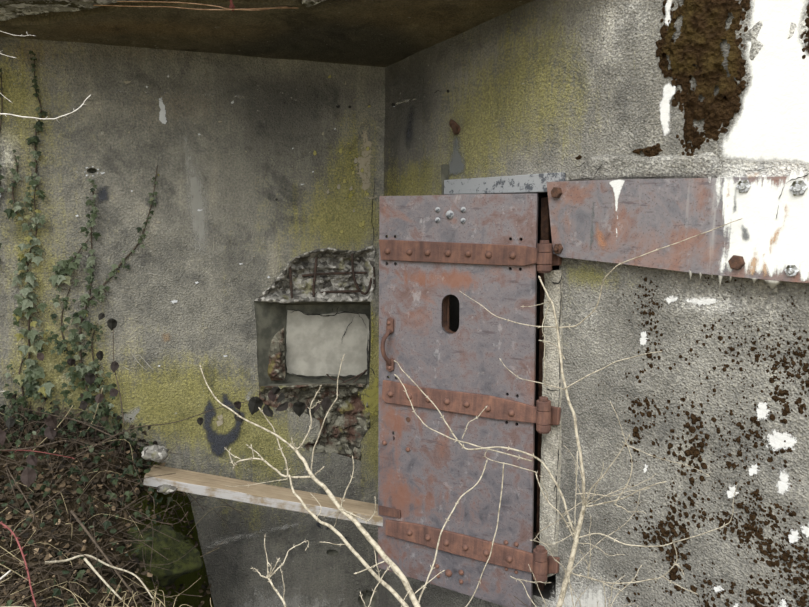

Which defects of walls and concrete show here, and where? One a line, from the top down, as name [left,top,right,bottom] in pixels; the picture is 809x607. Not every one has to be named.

spalling [254,245,376,303]